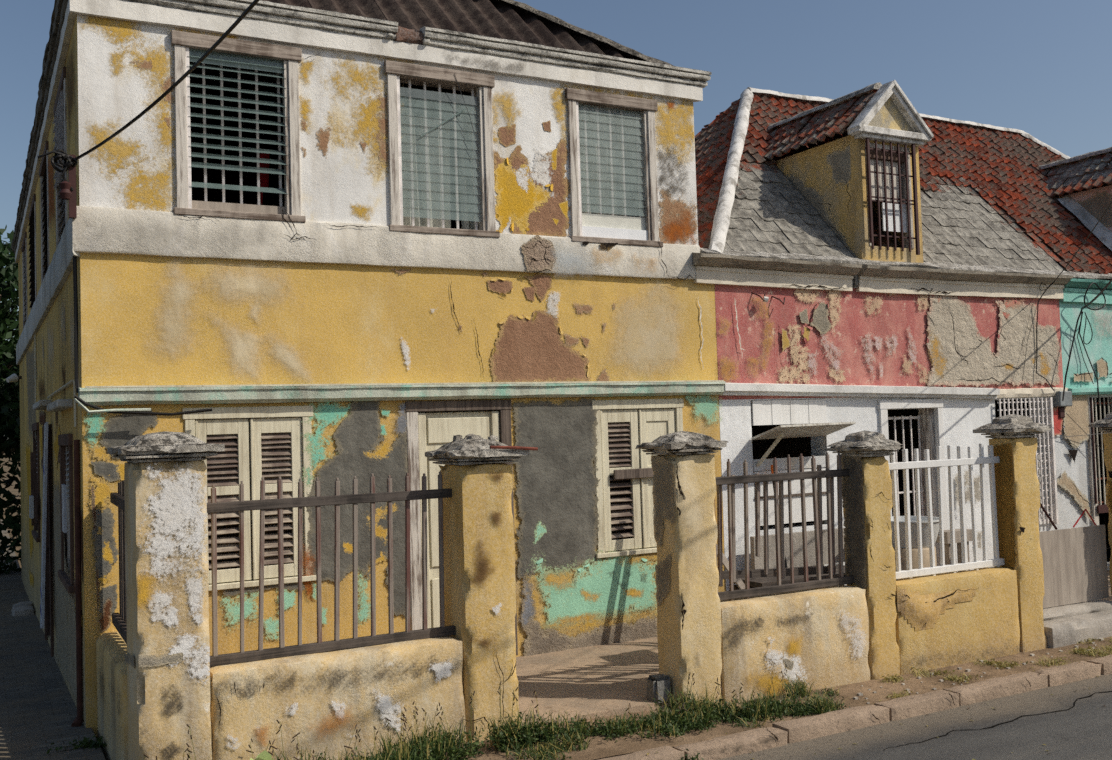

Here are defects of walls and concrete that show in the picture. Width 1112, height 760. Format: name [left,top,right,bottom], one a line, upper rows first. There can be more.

peeling [81,16,176,212]
peeling [299,57,413,174]
peeling [482,84,698,382]
crack [449,274,484,378]
flaking render [902,295,1061,387]
damp [140,463,210,685]
peeling [520,456,686,656]
flaking render [993,442,1025,570]
damp [161,743,182,760]
damp [161,685,184,717]
damp [222,672,296,697]
damp [308,654,455,691]